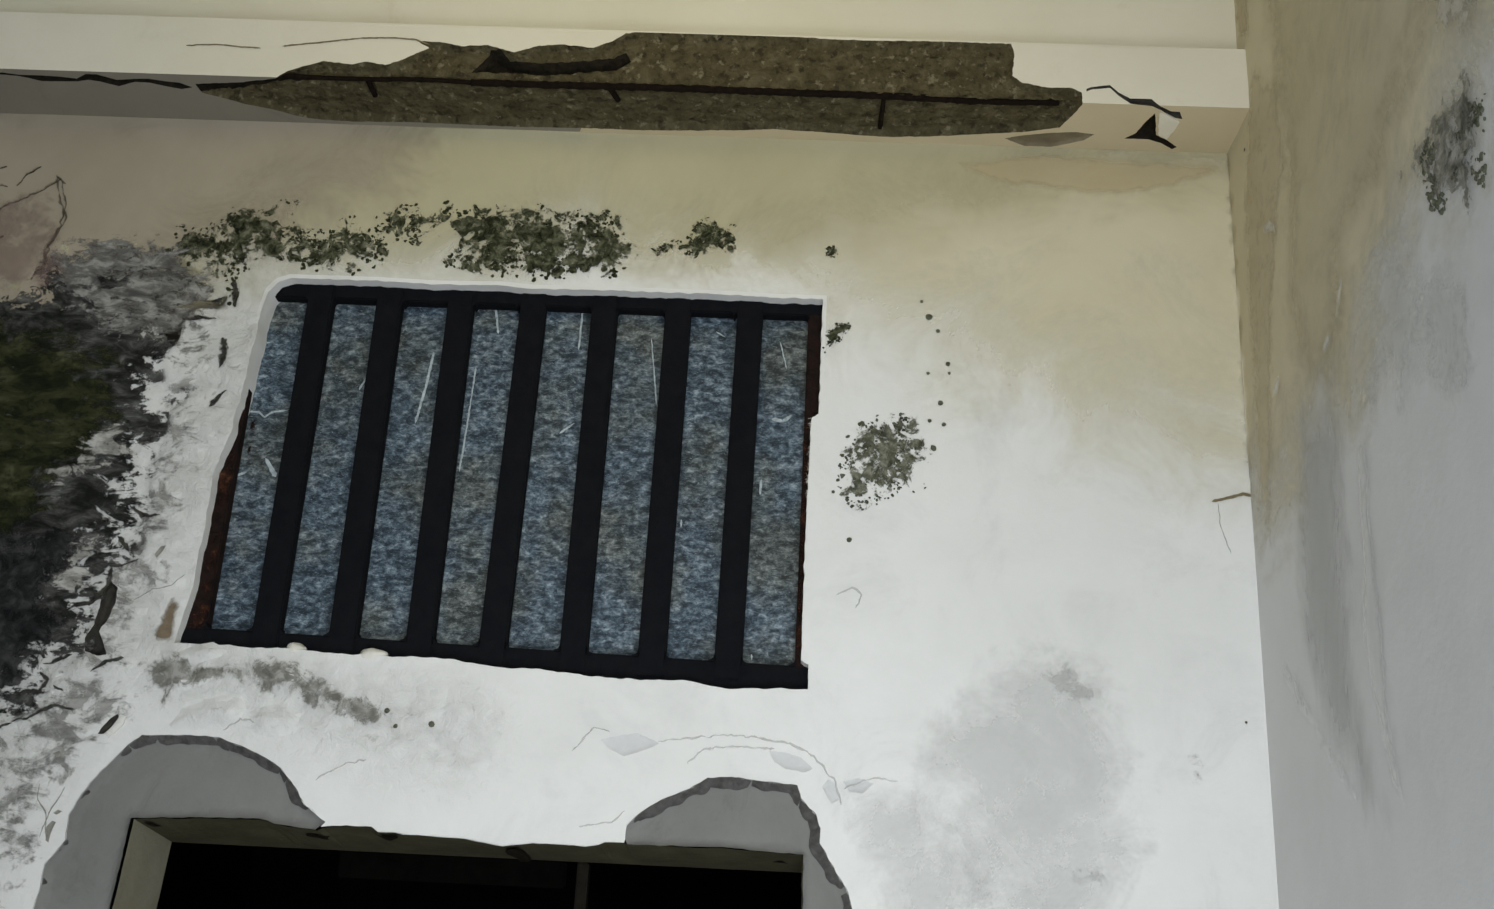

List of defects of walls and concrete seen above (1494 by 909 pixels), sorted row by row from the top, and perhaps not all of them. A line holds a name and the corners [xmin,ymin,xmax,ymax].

crack [0,72,191,89]
crack [186,37,428,48]
spalling [196,32,1094,147]
crack [1086,85,1182,149]
crack [0,166,67,279]
damp [264,0,1494,500]
damp [0,213,264,783]
rust [192,420,255,629]
spalling [600,733,659,756]
damp [0,784,46,861]
spalling [33,714,312,908]
spalling [629,751,852,909]